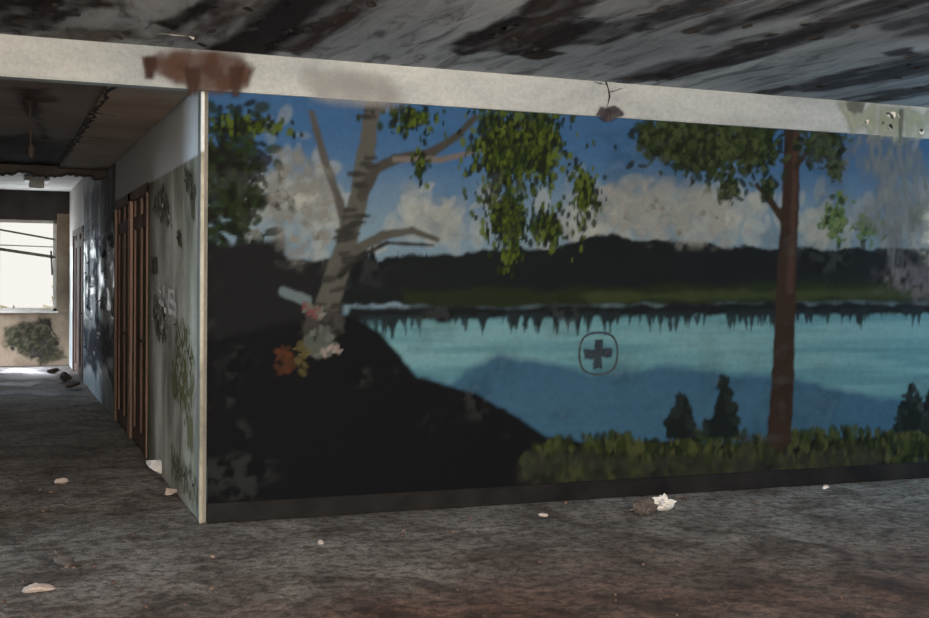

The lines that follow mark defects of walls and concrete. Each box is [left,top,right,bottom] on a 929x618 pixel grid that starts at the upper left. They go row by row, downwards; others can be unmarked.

water stain [0,0,139,42]
water stain [191,0,266,47]
water stain [596,0,929,83]
water stain [311,73,396,101]
water stain [757,47,929,95]
water stain [597,106,624,122]
water stain [171,319,195,451]